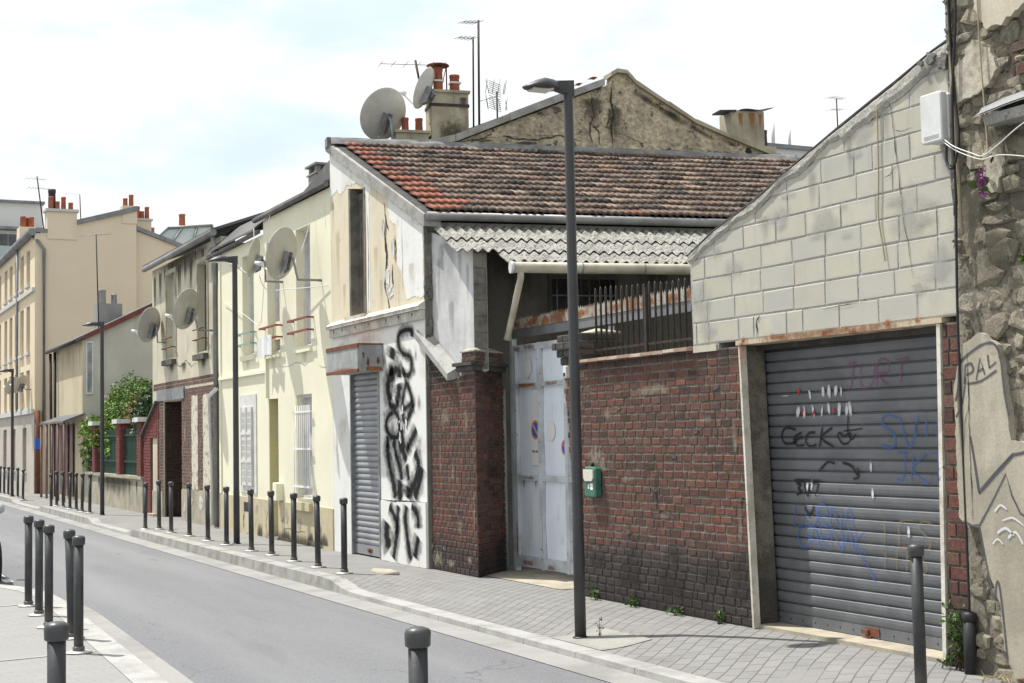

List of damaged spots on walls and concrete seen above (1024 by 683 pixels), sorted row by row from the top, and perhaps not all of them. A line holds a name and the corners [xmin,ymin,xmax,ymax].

crack [461,88,617,145]
leakage [584,98,620,127]
leakage [641,95,708,136]
peeling [329,155,433,311]
crack [367,206,403,309]